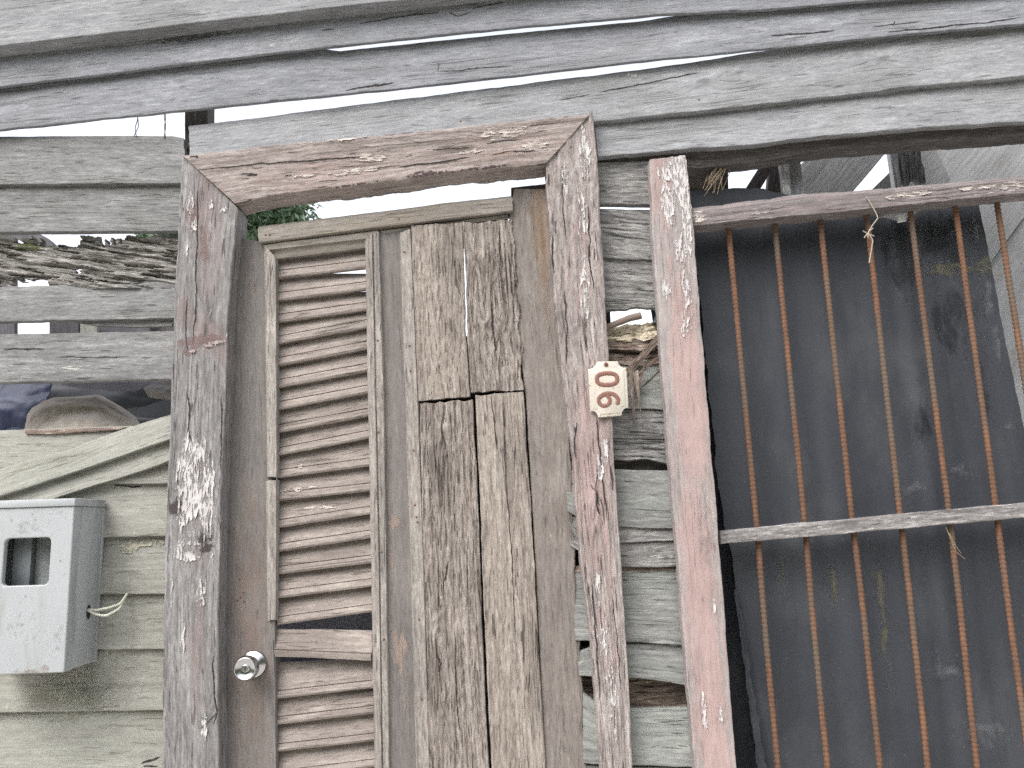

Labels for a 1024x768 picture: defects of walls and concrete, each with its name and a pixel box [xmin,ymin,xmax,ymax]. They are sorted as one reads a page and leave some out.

peeling [458,124,549,154]
peeling [656,155,701,337]
peeling [119,429,215,562]
crack [491,398,516,635]
crack [437,641,459,723]